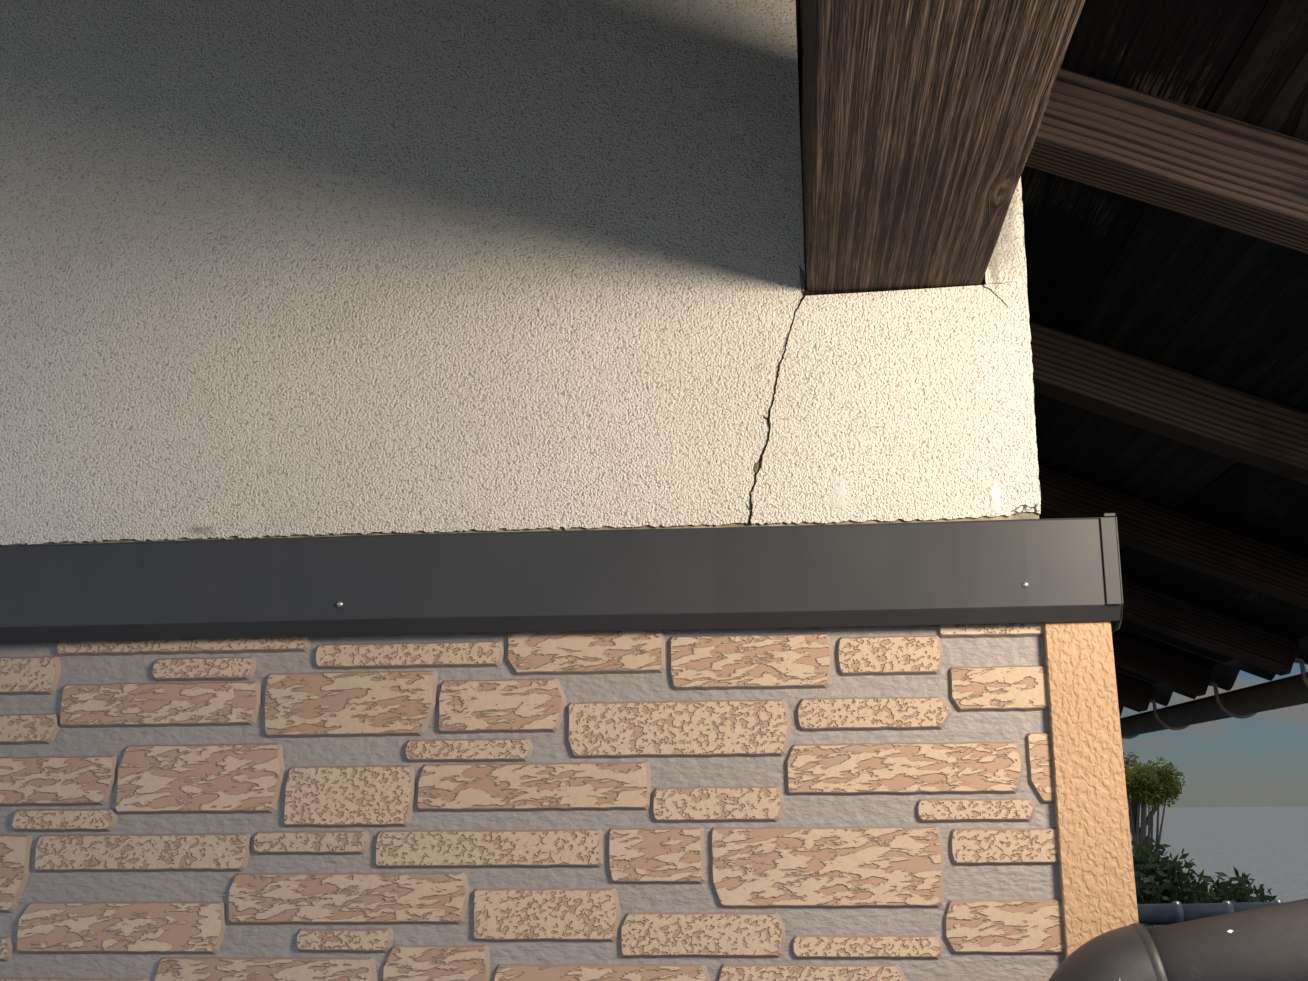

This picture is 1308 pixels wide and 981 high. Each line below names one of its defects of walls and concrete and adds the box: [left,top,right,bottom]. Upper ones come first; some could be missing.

crack [745,289,806,525]